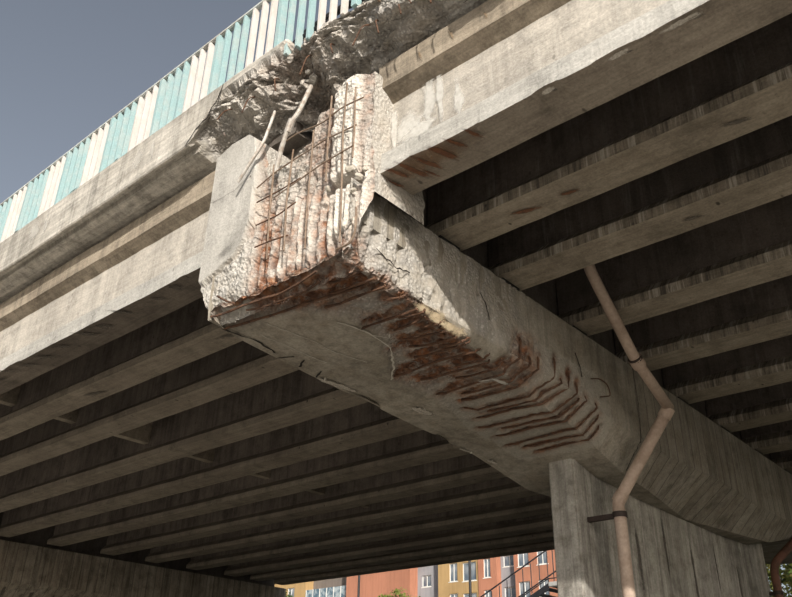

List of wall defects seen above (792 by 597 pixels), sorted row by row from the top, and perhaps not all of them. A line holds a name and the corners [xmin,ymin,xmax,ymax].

spalling [194,0,613,460]
corrosion [385,139,467,187]